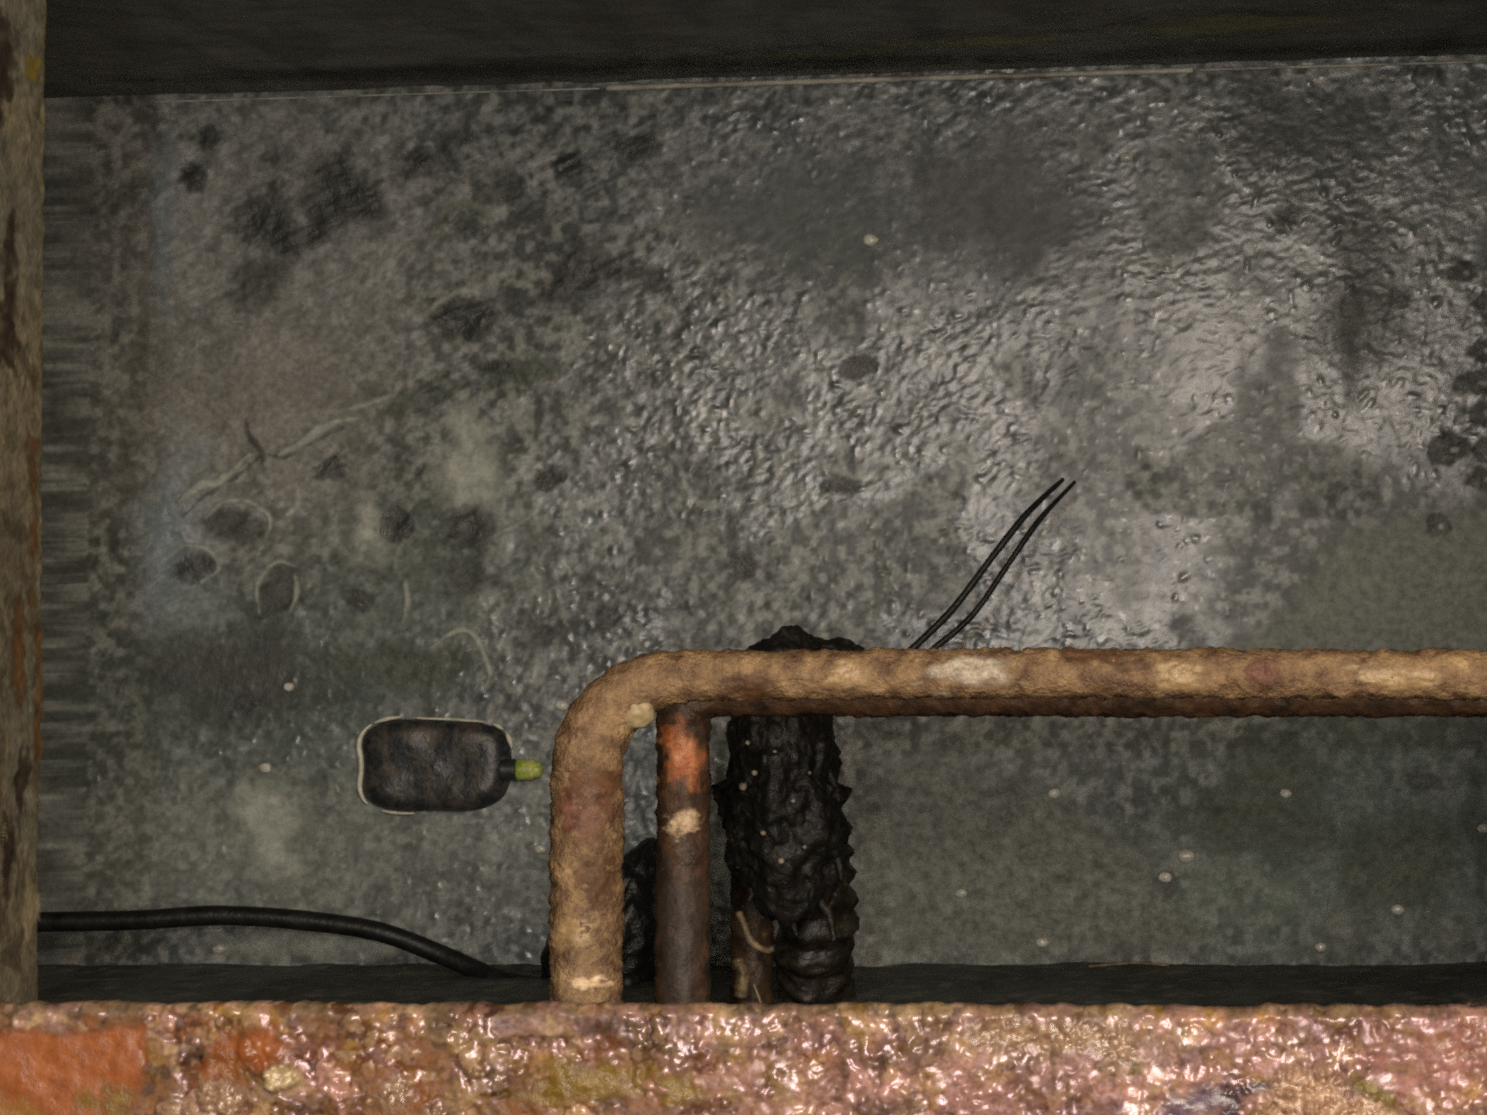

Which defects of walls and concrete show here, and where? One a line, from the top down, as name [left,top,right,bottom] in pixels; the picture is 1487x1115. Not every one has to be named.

leakage [230,151,381,307]
leakage [432,288,493,338]
leakage [1318,222,1395,400]
leakage [146,498,272,605]
leakage [355,496,386,561]
leakage [404,379,500,591]
leakage [1235,496,1487,651]
rust [1061,649,1147,671]
leakage [235,782,307,882]
rust [659,720,705,842]
leakage [207,931,394,961]
rust [0,1025,147,1115]